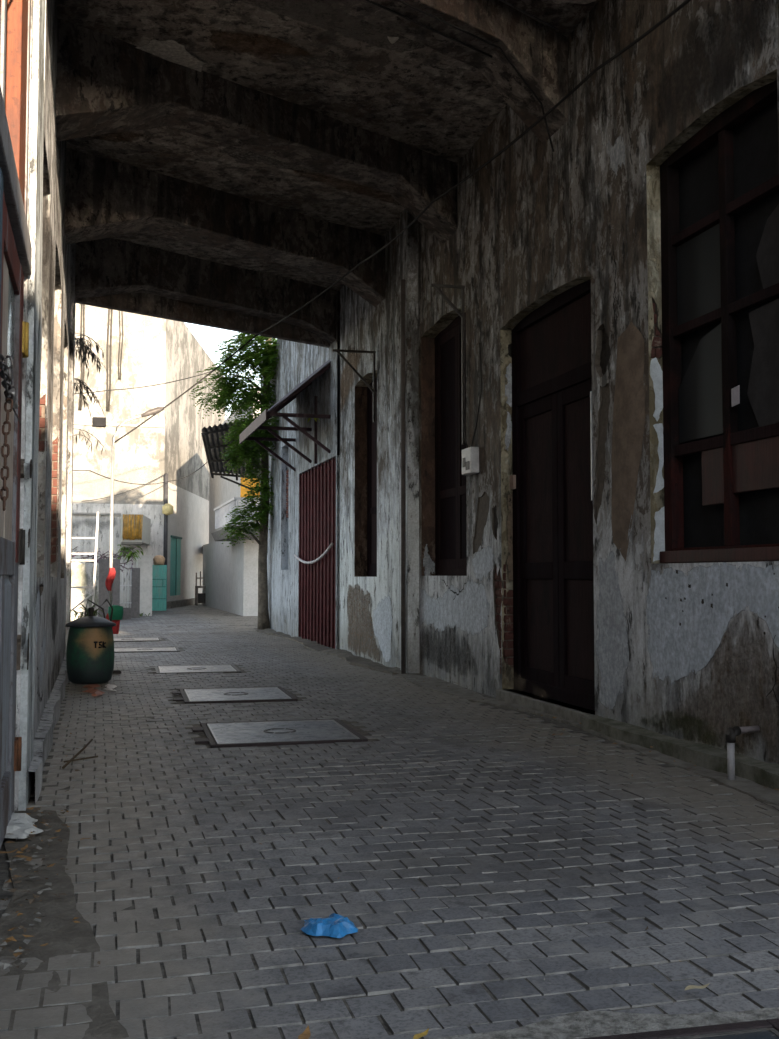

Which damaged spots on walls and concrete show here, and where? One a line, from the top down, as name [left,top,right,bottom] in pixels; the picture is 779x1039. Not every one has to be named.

damp [347,584,380,662]
damp [676,614,779,761]